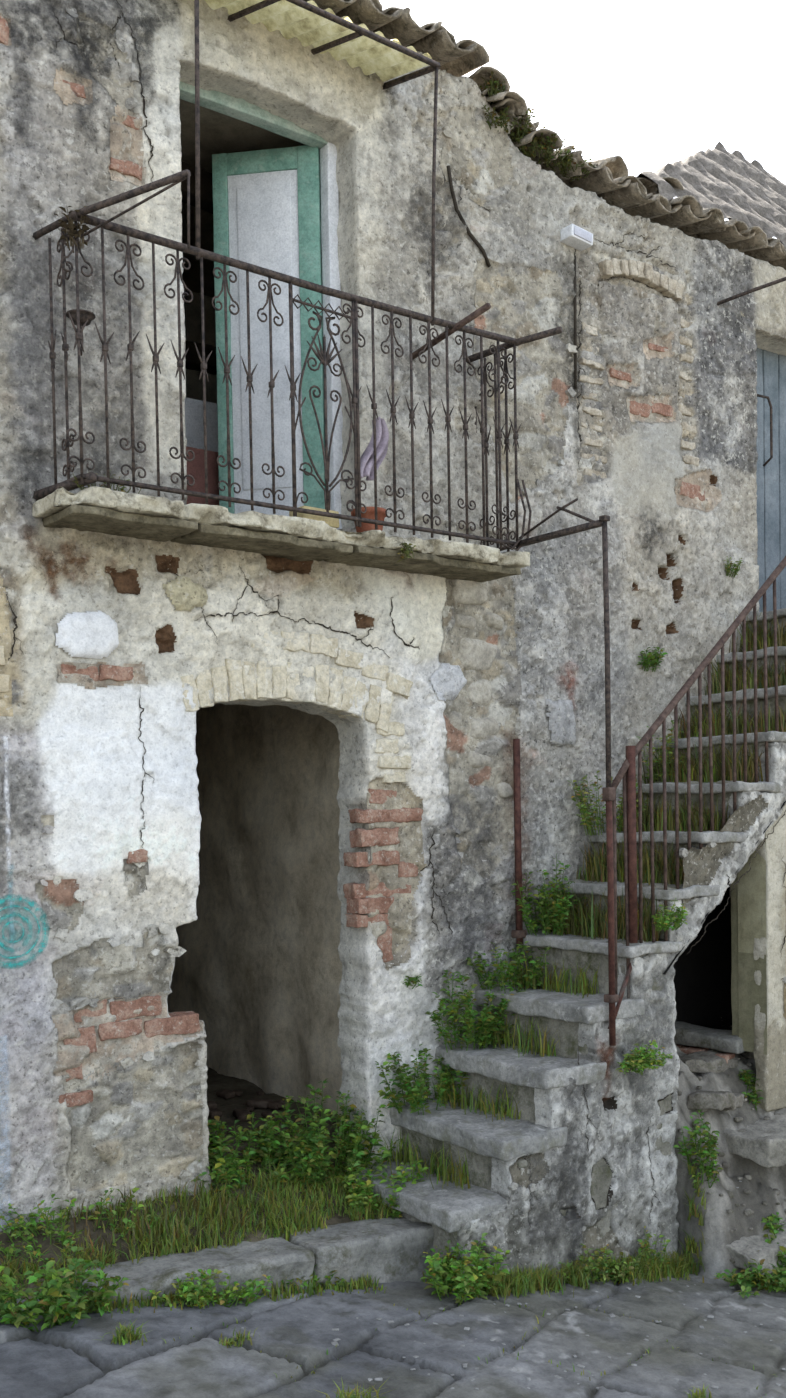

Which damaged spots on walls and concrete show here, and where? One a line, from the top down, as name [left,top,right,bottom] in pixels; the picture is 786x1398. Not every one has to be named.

crack [54,0,154,179]
flaking render [605,331,676,424]
flaking render [674,468,722,513]
crack [174,566,420,659]
crack [138,688,154,848]
flaking render [343,777,427,971]
peeling [35,875,205,1198]
peeling [564,1158,629,1265]